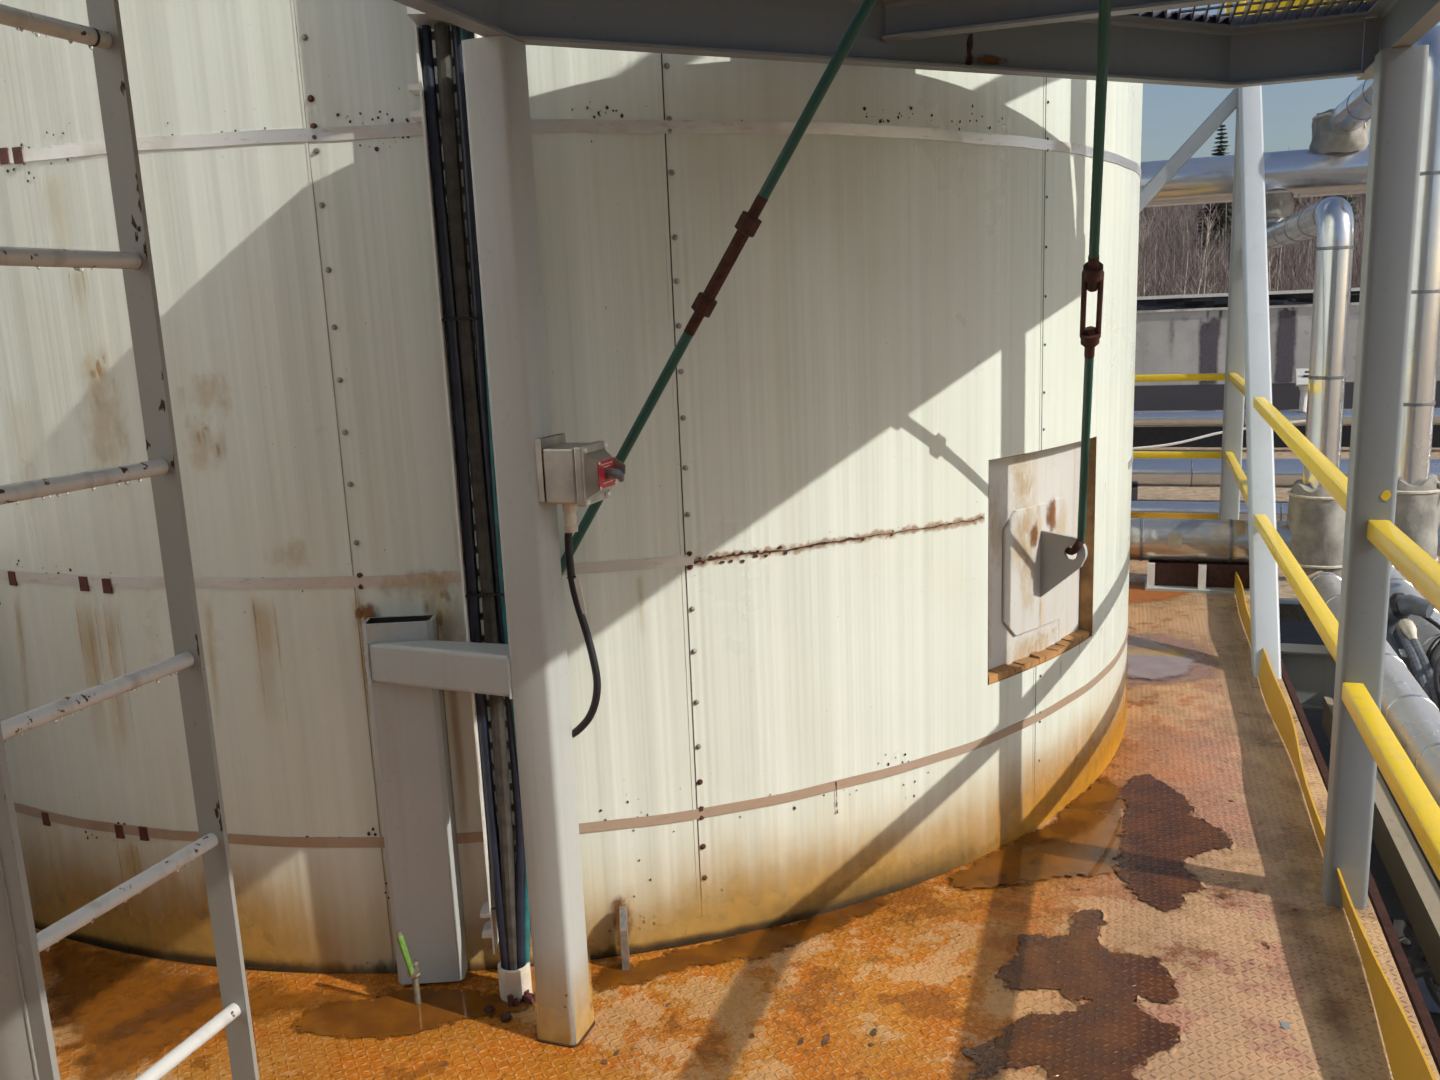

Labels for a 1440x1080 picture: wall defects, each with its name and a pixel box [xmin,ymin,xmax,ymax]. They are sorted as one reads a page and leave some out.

rust [1031,500,1056,545]
leakage [1126,634,1218,688]
rust [991,689,1127,852]
peeling [1112,774,1238,913]
leakage [825,873,943,913]
leakage [127,952,217,967]
peeling [955,908,1190,1080]